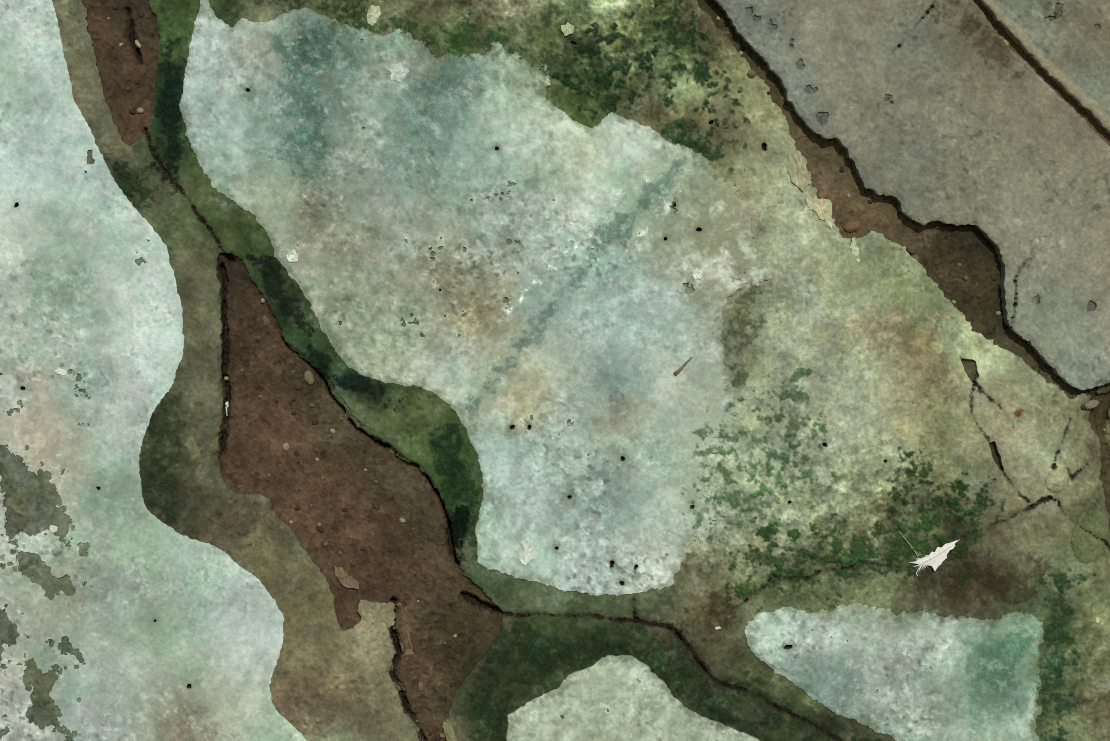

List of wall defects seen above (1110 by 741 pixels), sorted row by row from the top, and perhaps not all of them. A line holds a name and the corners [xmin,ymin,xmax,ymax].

peeling [0,445,90,600]
spalling [52,0,858,741]
crack [290,345,842,741]
crack [744,562,890,602]
crack [970,381,1014,444]
crack [964,418,1087,537]
peeling [0,604,86,741]